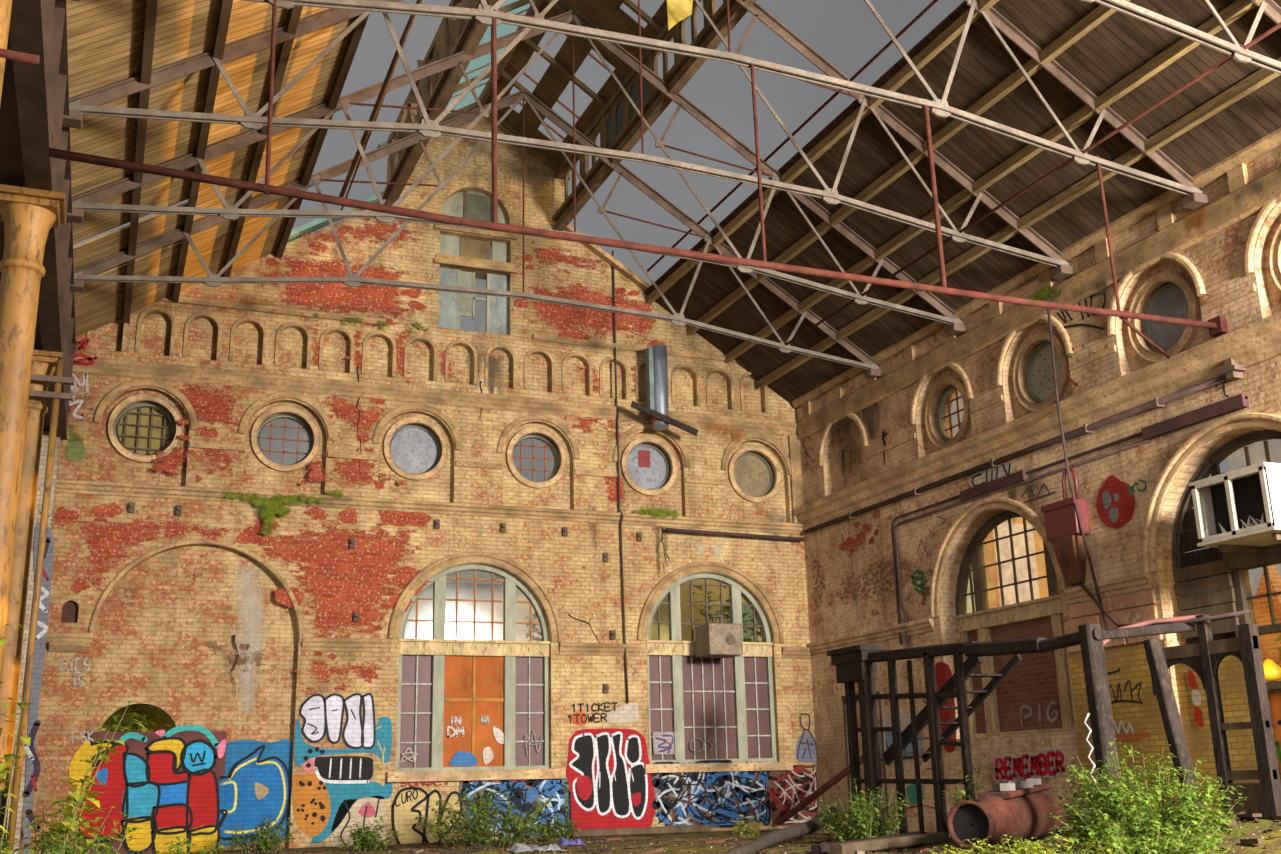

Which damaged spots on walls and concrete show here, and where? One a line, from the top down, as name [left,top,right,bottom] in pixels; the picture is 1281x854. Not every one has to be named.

peeling [265,210,426,384]
peeling [513,241,665,347]
peeling [53,502,432,695]